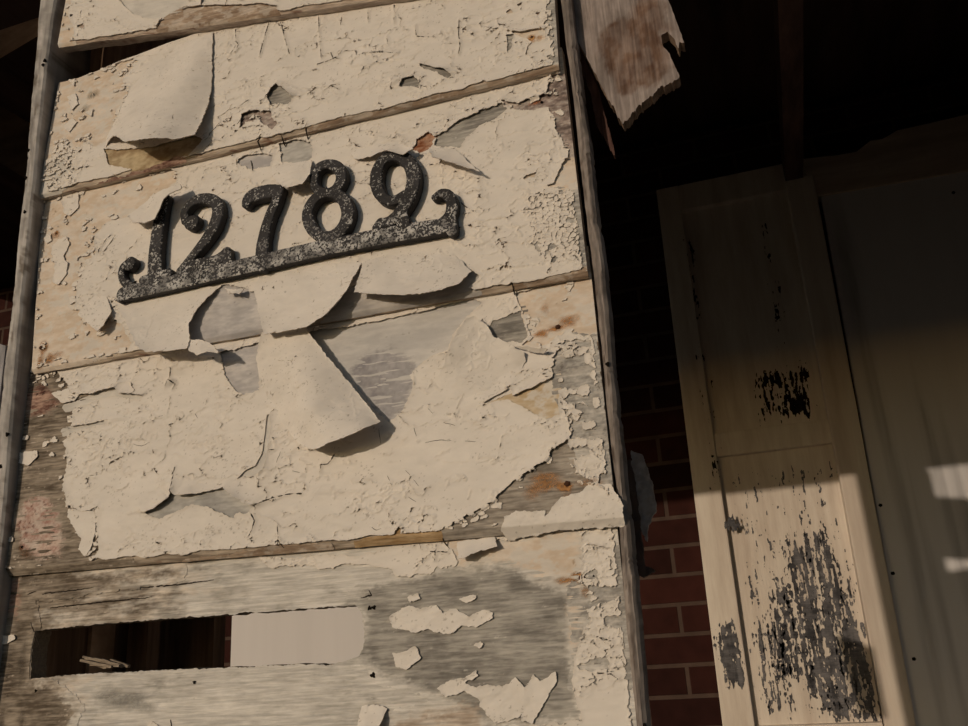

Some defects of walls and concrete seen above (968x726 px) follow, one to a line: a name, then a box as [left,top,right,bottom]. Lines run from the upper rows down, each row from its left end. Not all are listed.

peeling [0,0,633,726]
corrosion [536,317,572,336]
peeling [631,451,657,542]